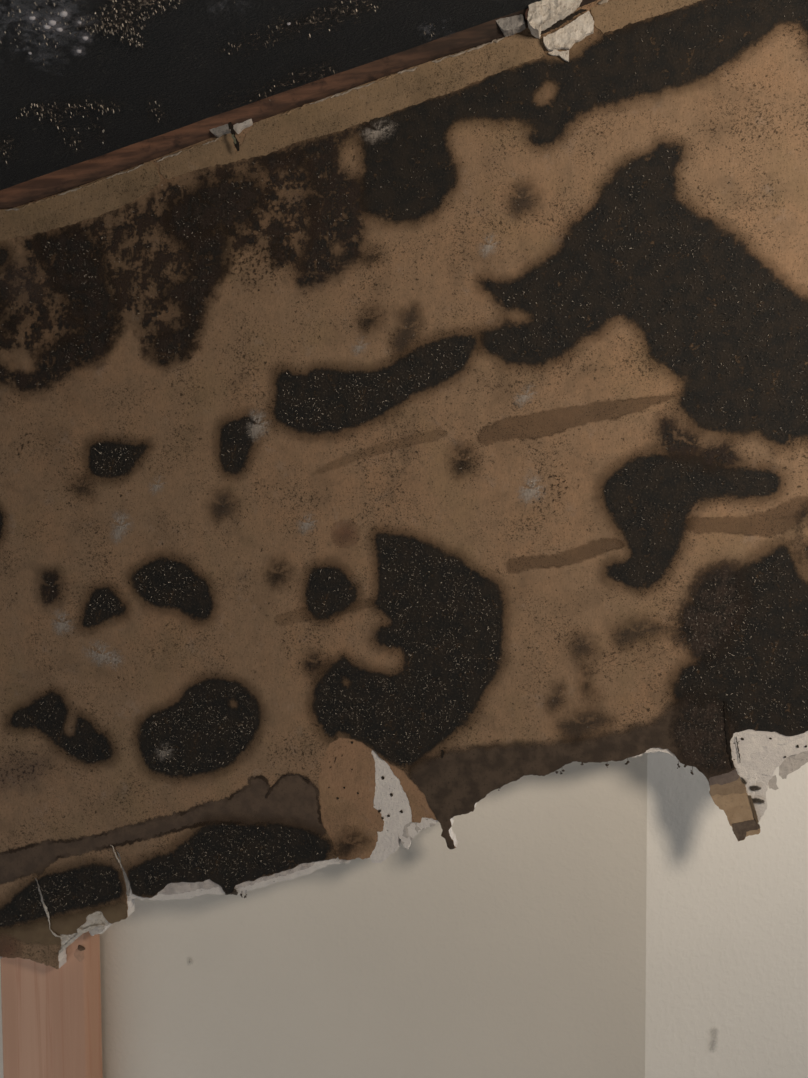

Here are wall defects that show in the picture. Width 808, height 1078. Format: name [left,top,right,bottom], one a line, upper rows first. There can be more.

peeling [496,14,526,37]
peeling [543,11,594,62]
damp [0,0,808,392]
damp [219,142,808,592]
damp [77,440,149,494]
damp [81,587,127,628]
damp [130,556,214,622]
damp [8,691,113,764]
damp [137,678,262,778]
crack [111,845,130,896]
damp [0,773,334,957]
crack [35,879,62,940]